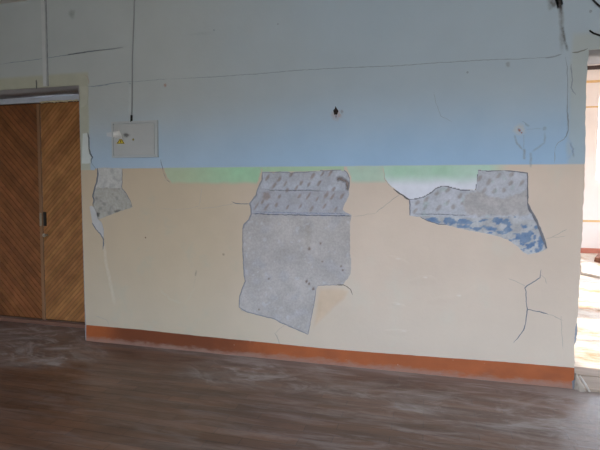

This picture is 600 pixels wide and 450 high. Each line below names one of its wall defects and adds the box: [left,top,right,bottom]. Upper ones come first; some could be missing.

crack [179,48,588,162]
flaking render [82,133,132,306]
flaking render [160,159,353,335]
flaking render [383,163,547,254]
crack [510,271,563,346]